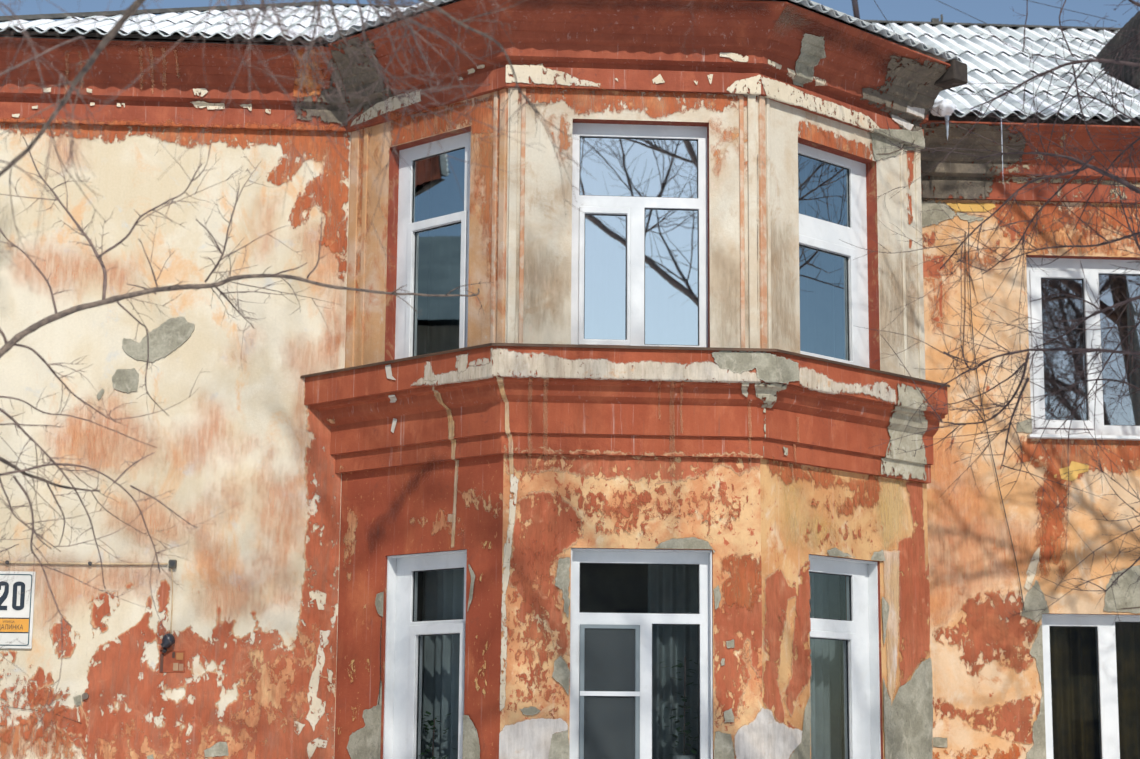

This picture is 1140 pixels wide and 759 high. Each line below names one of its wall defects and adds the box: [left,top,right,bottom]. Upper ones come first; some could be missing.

peeling [0,45,500,281]
spalling [506,33,1140,323]
spalling [97,317,195,400]
peeling [0,388,384,759]
peeling [411,347,1140,759]